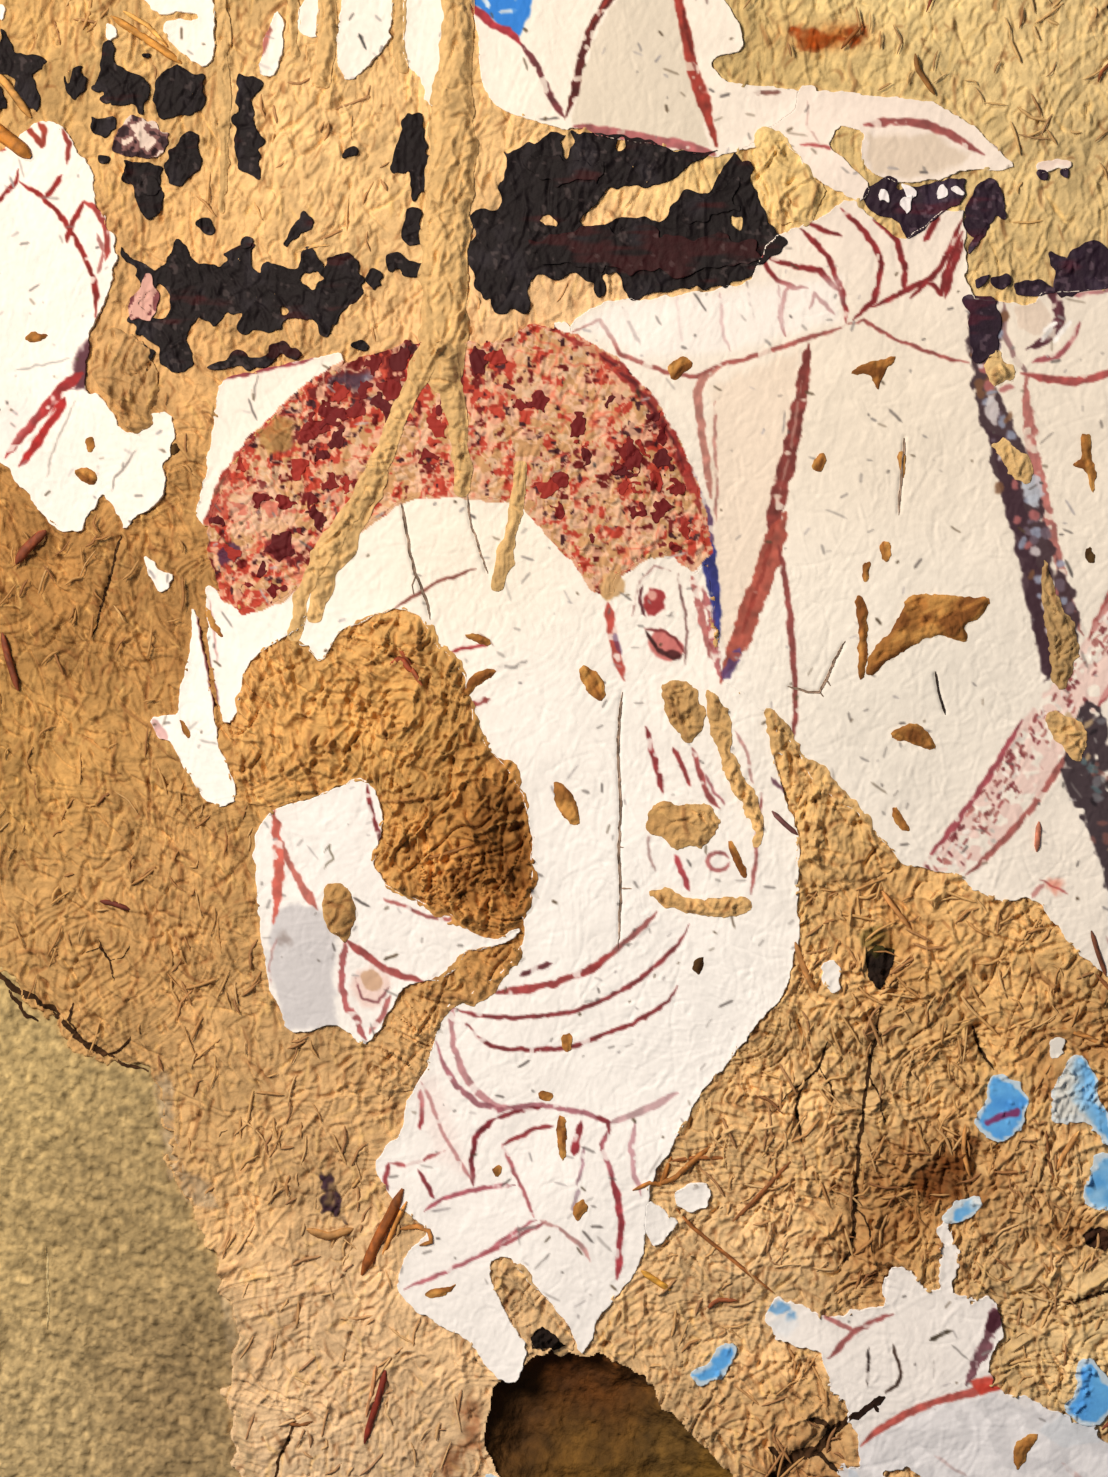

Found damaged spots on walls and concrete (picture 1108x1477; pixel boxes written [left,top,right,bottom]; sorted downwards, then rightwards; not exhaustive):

flaking render [891,723,936,750]
spalling [646,680,764,878]
spalling [764,708,899,883]
flaking render [892,807,910,831]
spalling [230,607,538,1100]
spalling [649,887,752,918]
crack [86,939,130,978]
flaking render [692,957,704,974]
crack [0,972,149,1072]
peeling [974,1074,1029,1142]
peeling [690,1343,737,1386]
crack [768,1396,885,1477]